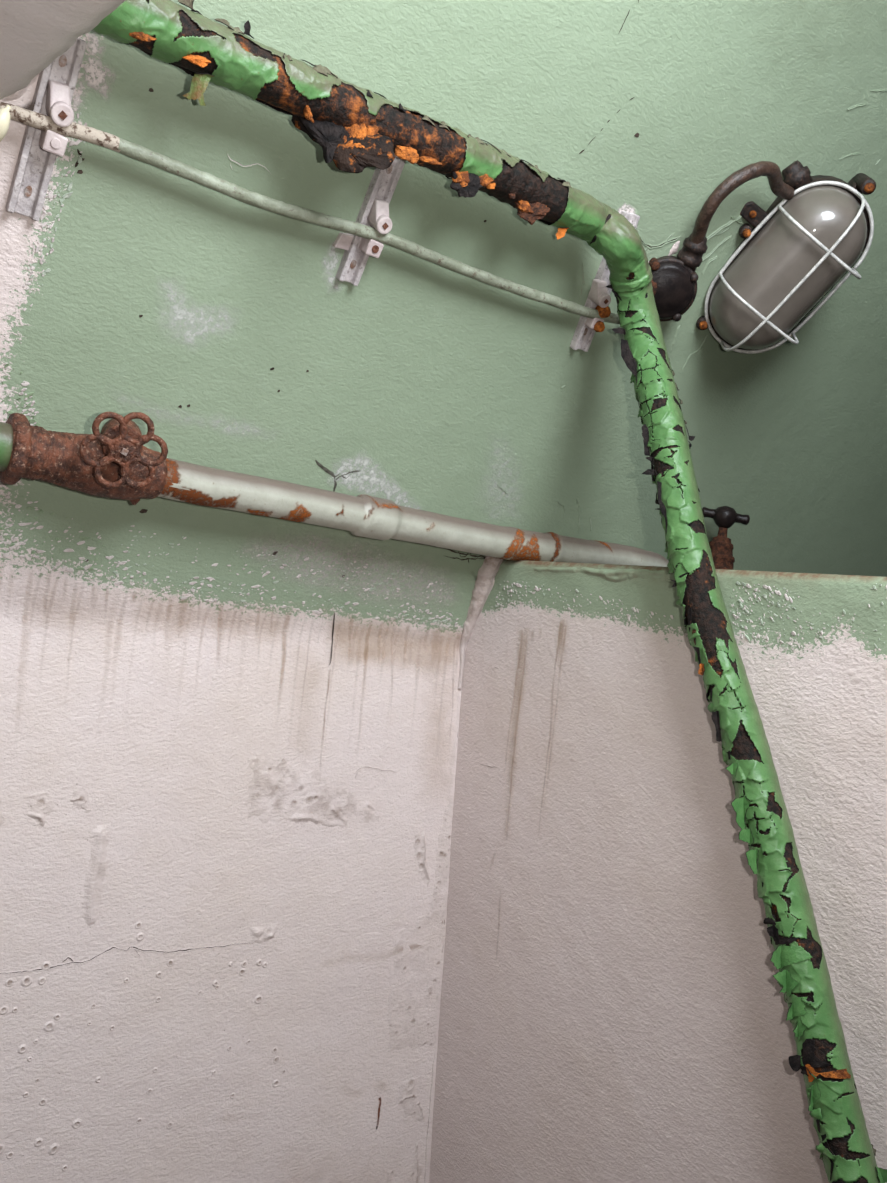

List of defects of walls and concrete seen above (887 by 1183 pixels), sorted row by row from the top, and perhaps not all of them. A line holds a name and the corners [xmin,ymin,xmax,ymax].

crack [0,942,255,974]